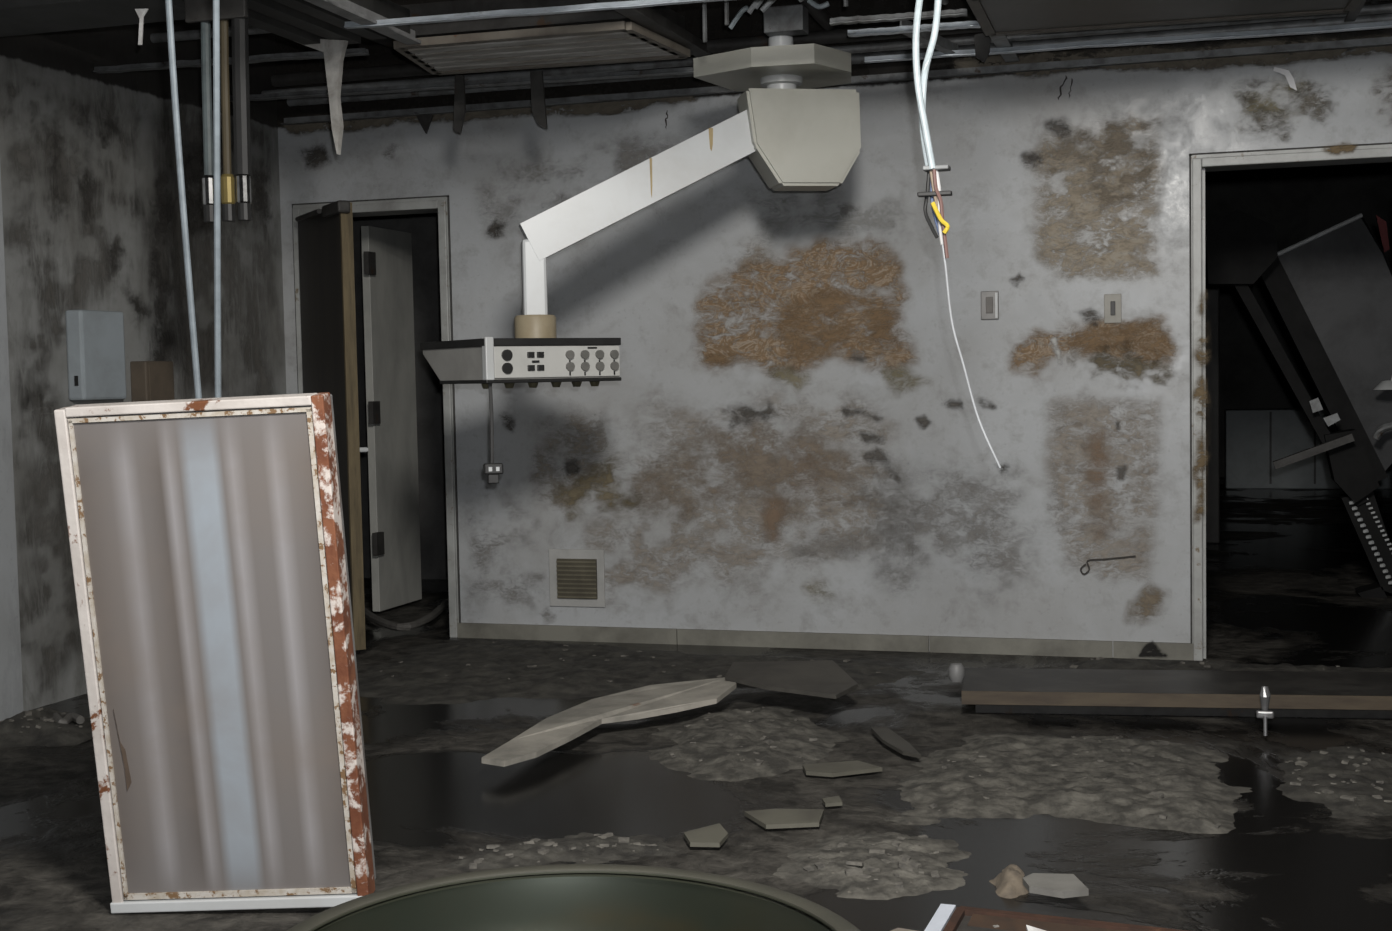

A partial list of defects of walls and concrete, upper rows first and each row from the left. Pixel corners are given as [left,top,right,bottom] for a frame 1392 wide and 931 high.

spalling [283,94,697,134]
spalling [954,35,1392,90]
damp [5,92,275,687]
damp [534,404,1018,589]